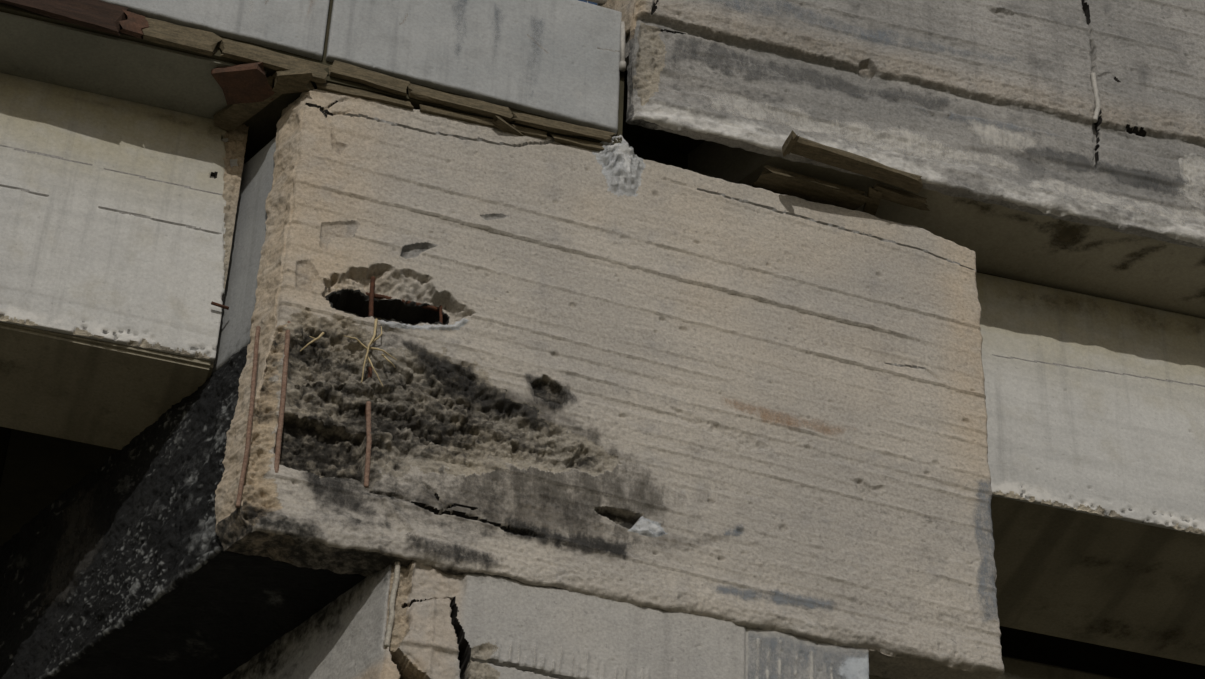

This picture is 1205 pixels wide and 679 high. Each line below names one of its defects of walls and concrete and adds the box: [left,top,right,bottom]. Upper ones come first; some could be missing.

crack [1081,0,1091,25]
crack [305,100,555,147]
crack [1090,72,1147,166]
spalling [295,220,360,292]
spalling [400,241,438,259]
spalling [235,307,621,525]
crack [411,493,511,533]
spalling [594,506,645,529]
crack [402,596,576,679]